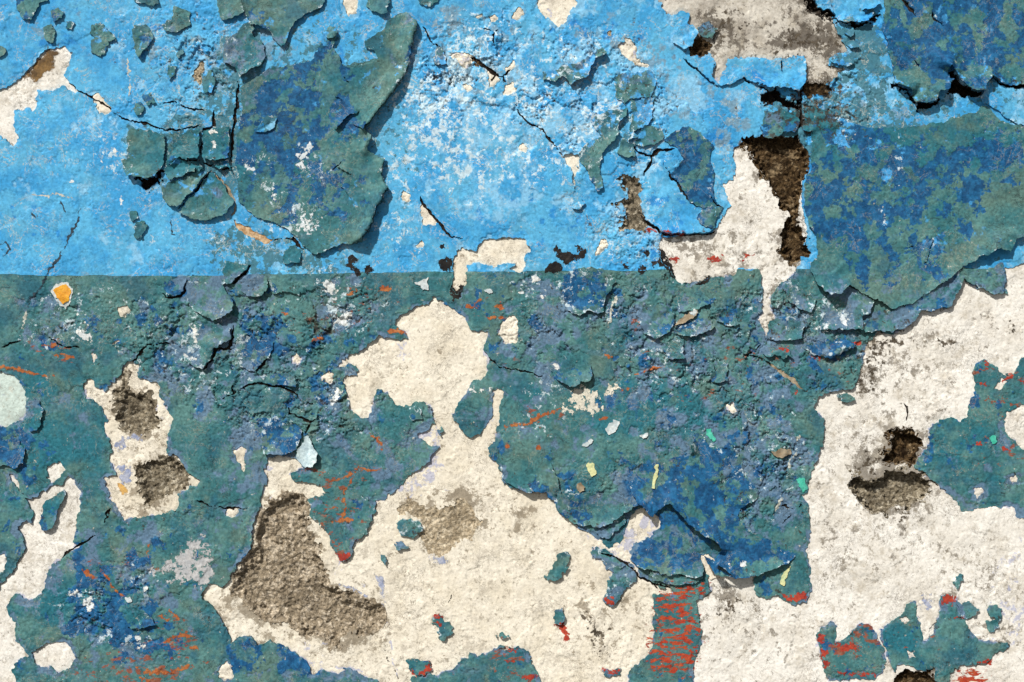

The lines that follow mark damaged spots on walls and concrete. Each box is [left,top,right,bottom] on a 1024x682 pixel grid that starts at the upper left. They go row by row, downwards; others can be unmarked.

flaking render [0,0,79,146]
crack [69,81,240,216]
crack [517,109,558,149]
flaking render [610,0,1024,682]
flaking render [0,371,81,682]
flaking render [83,360,200,520]
flaking render [201,296,795,682]